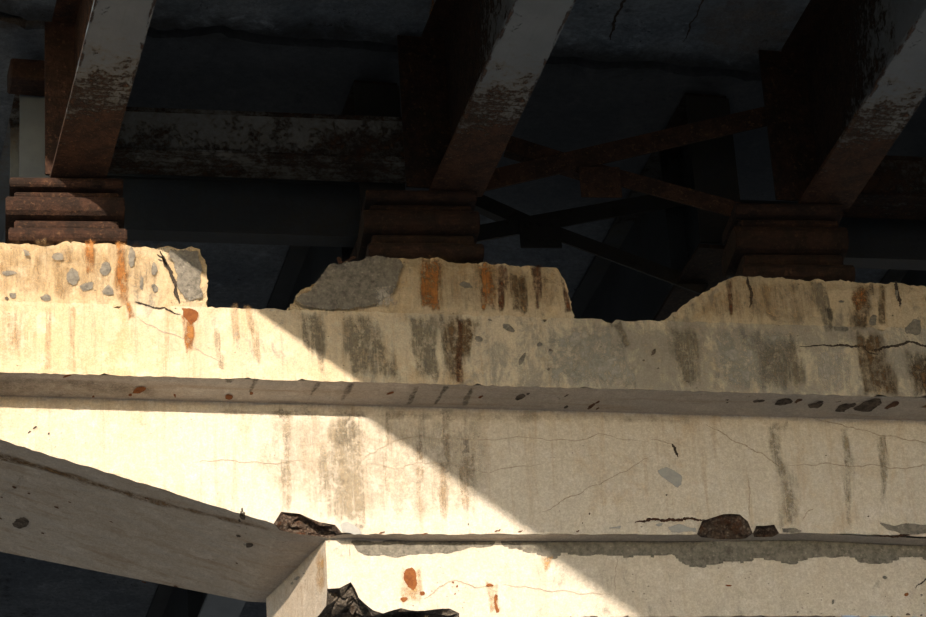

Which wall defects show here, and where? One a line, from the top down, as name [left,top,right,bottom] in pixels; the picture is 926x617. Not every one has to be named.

crack [609,0,626,40]
rust [116,242,133,318]
crack [136,251,223,363]
rust [182,308,198,353]
water stain [302,315,325,369]
water stain [344,317,396,375]
water stain [411,317,476,404]
crack [800,341,926,355]
water stain [320,421,365,518]
peeling [274,512,926,568]
spalling [318,582,459,617]
rust [400,567,425,602]